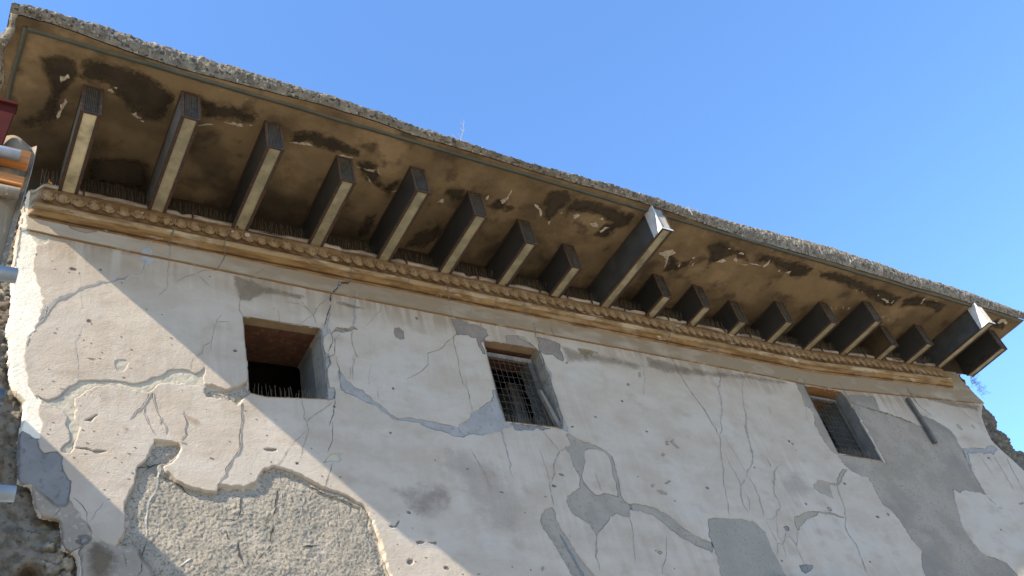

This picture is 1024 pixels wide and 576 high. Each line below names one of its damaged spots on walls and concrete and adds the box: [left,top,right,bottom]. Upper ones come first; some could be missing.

leakage [23,56,173,127]
leakage [201,101,255,123]
leakage [293,130,398,193]
leakage [545,191,634,238]
crack [26,217,227,345]
leakage [707,243,944,313]
crack [278,261,409,499]
crack [137,464,192,497]
crack [218,402,243,485]
peeling [38,369,427,576]
crack [667,329,805,564]
crack [226,490,297,563]